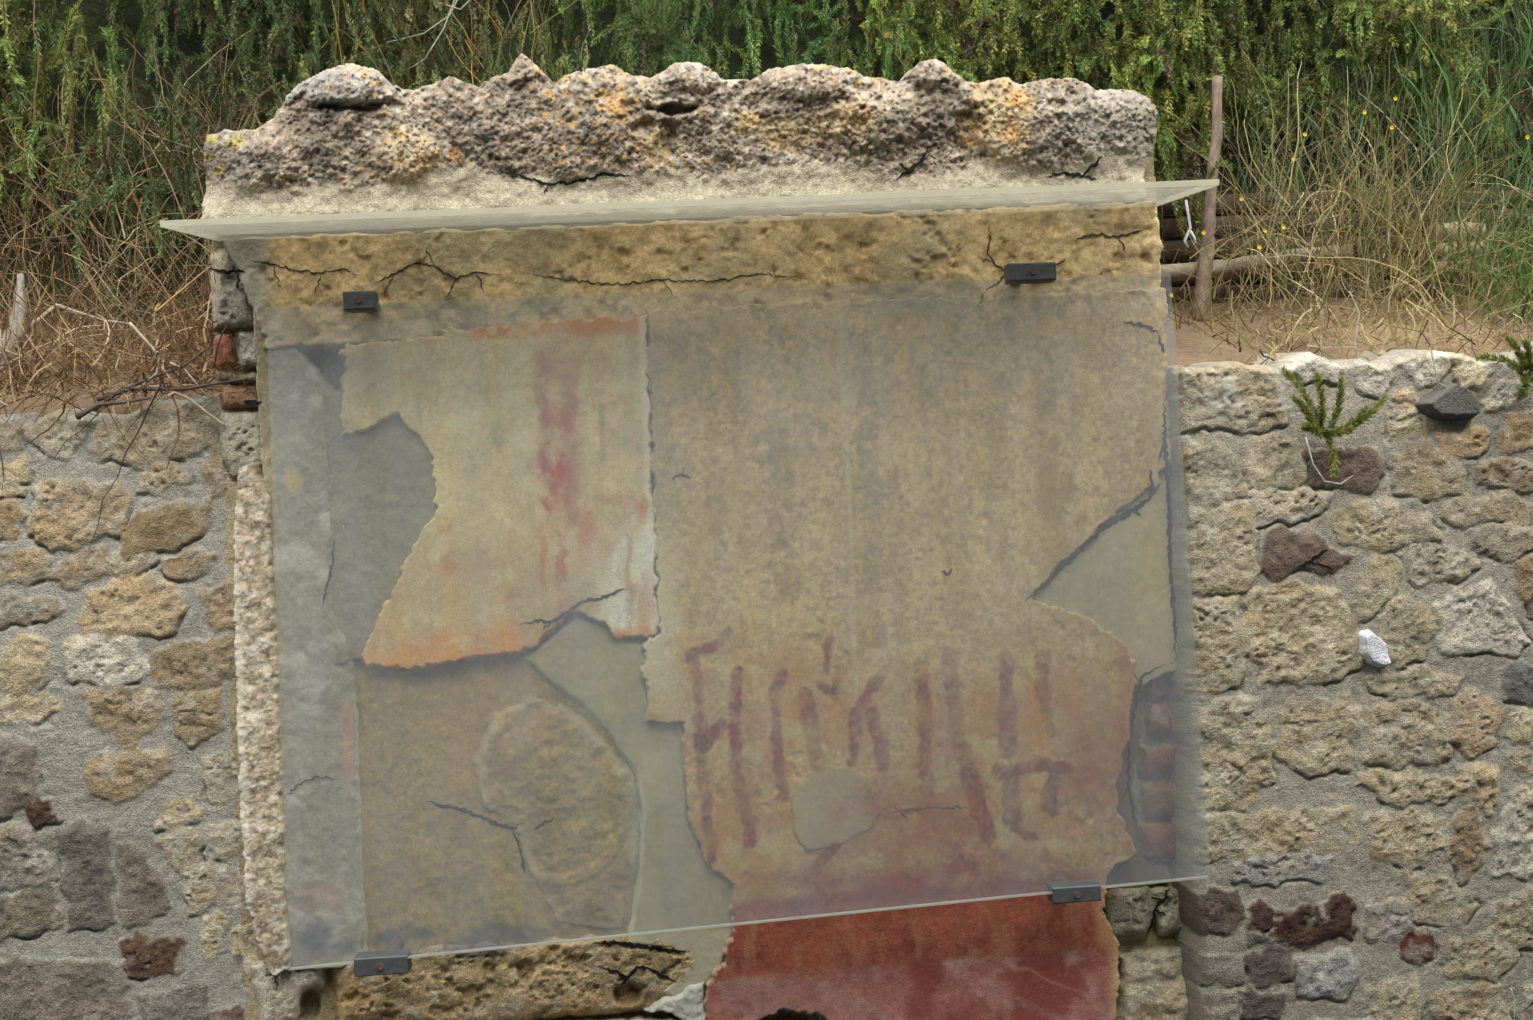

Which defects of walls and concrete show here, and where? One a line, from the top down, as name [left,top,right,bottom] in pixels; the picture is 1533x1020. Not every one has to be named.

crack [205,247,800,296]
crack [977,224,1004,307]
crack [1056,229,1147,265]
crack [519,588,627,629]
crack [1025,398,1177,872]
spalling [1032,469,1178,689]
spalling [323,388,638,959]
crack [426,801,553,873]
spalling [643,982,707,1020]